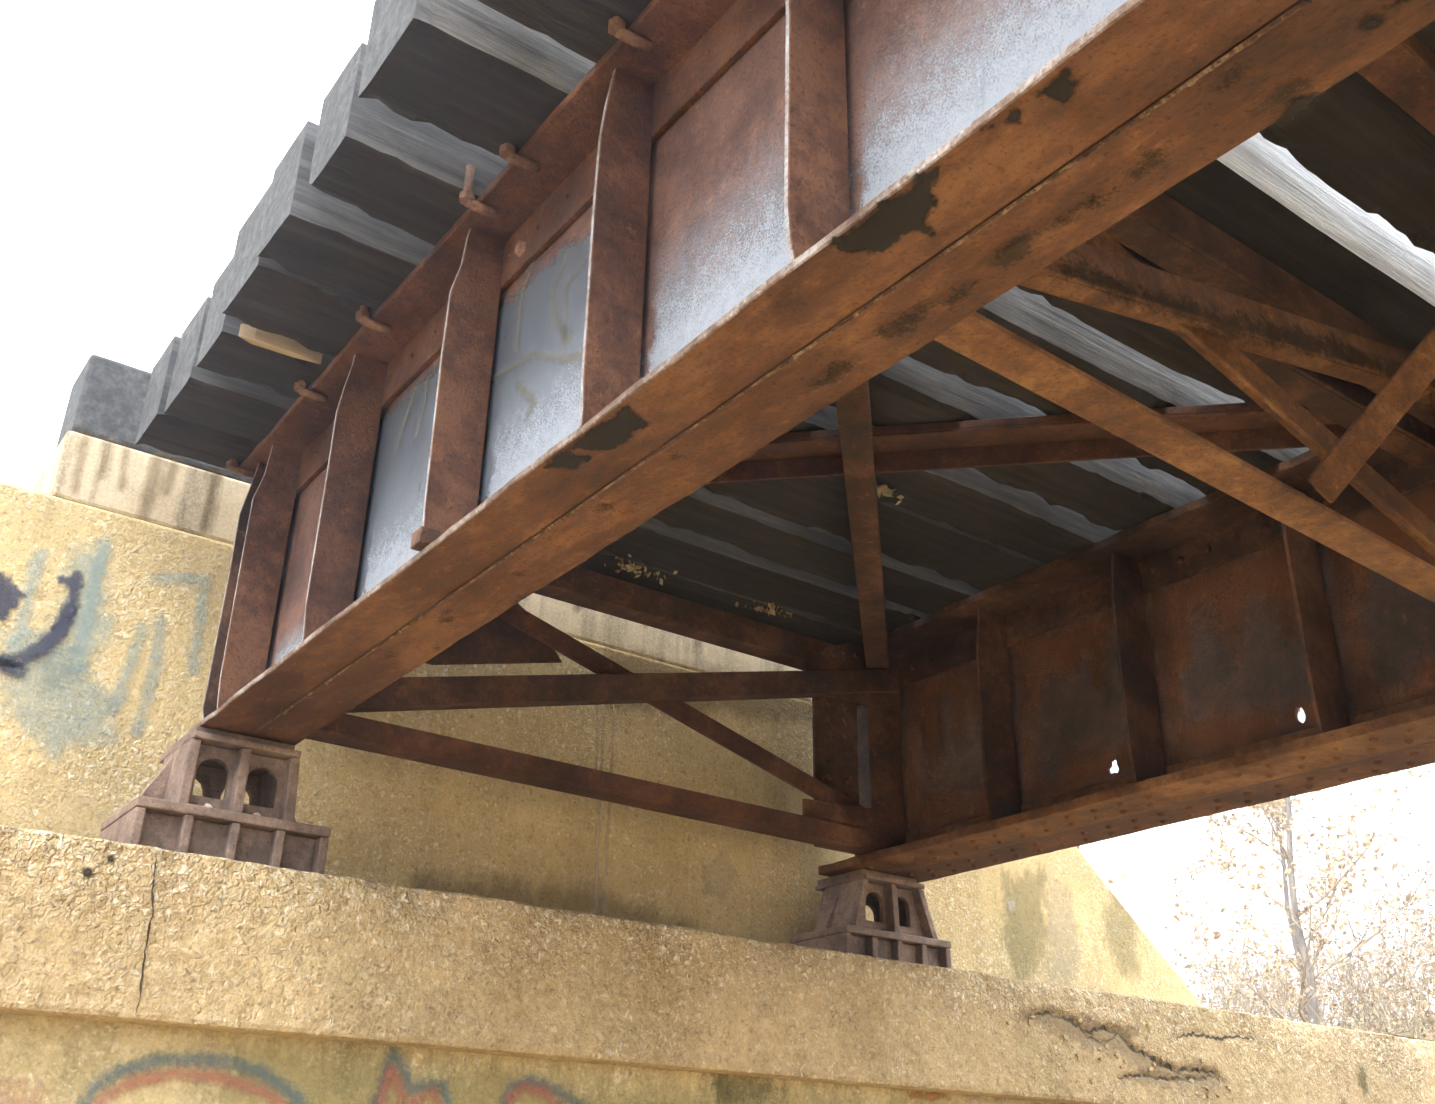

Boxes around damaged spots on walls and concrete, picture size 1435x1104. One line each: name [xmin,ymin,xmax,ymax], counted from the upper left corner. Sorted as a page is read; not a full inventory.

peeling [478,233,591,506]
crack [135,856,157,1014]
crack [1034,1011,1254,1083]